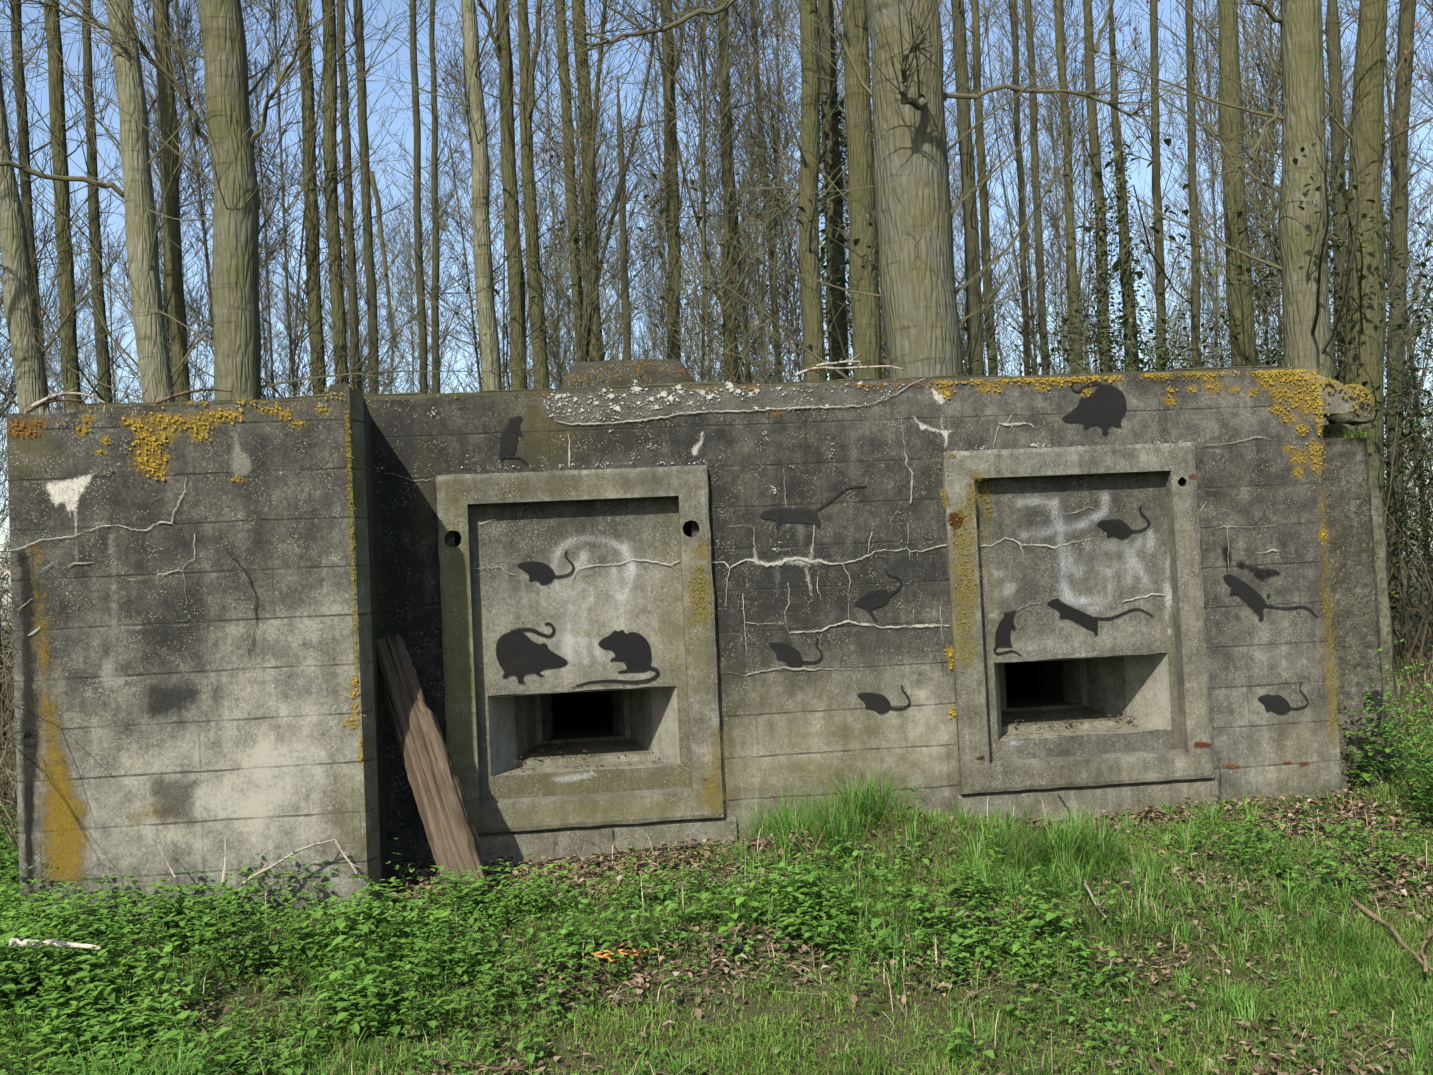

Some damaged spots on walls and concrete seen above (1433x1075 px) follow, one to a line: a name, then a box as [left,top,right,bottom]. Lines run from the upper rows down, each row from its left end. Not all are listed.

crack [993,415,1034,448]
leakage [46,475,91,525]
crack [8,477,257,656]
crack [572,418,949,676]
corrosion [948,512,964,535]
crack [981,506,1103,557]
crack [1123,593,1165,602]
leakage [17,551,39,893]